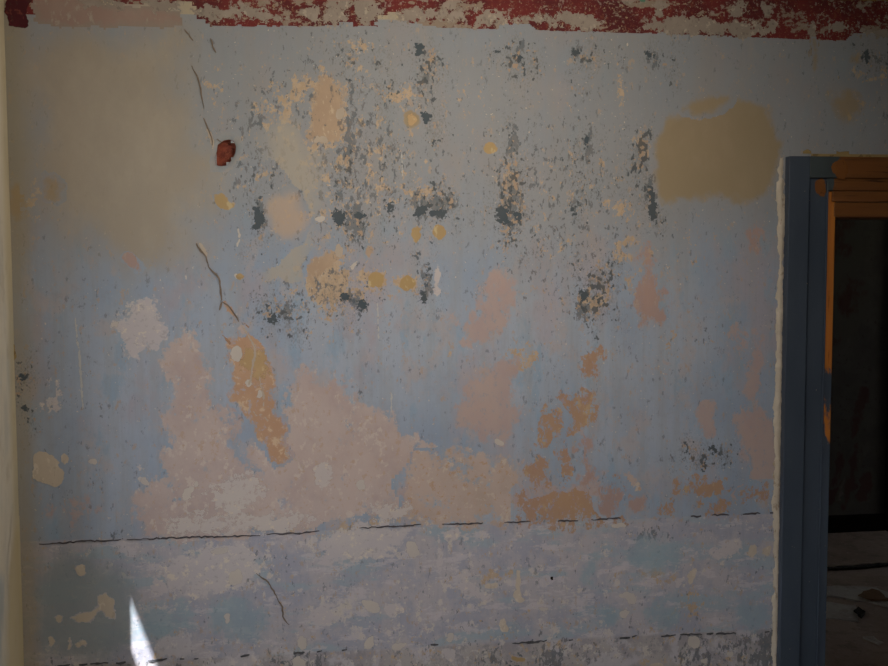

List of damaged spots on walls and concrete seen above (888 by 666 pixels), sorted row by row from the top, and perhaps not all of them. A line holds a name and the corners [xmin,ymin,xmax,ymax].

peeling [140,0,384,27]
peeling [395,0,605,32]
peeling [621,0,778,39]
flaking render [299,65,355,152]
spalling [209,131,243,173]
crack [196,243,239,322]
peeling [23,283,556,666]
crack [40,531,317,545]
crack [361,522,421,530]
crack [442,519,483,527]
crack [661,630,736,638]
crack [148,656,199,664]